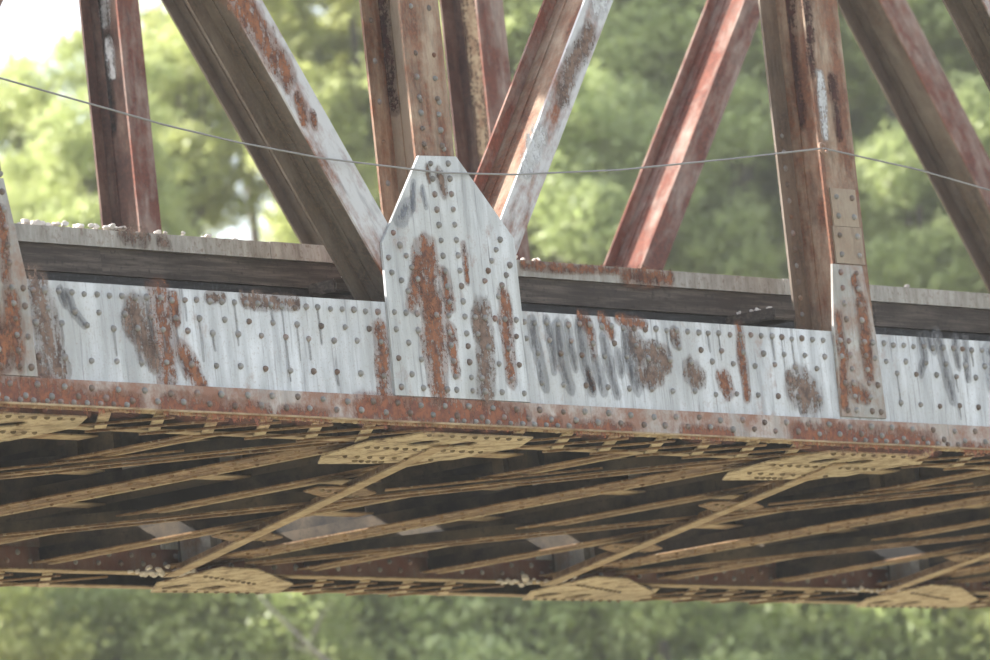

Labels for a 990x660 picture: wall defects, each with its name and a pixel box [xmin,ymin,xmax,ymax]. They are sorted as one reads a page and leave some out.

rust [227,0,317,128]
rust [0,204,142,417]
rust [121,281,328,427]
rust [353,234,634,438]
rust [576,310,649,358]
damp [529,317,707,396]
rust [679,425,734,444]
rust [716,323,751,402]
rust [835,273,874,408]
rust [785,366,941,456]
damp [919,331,974,416]